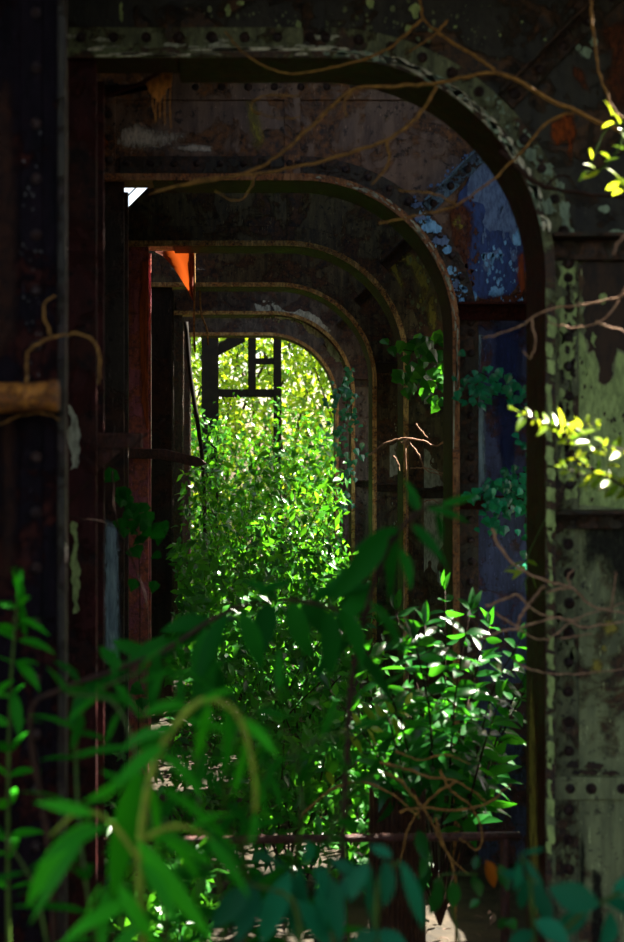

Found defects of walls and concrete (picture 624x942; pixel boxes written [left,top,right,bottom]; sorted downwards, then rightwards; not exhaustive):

peeling [87,0,574,232]
peeling [335,153,526,449]
peeling [390,423,398,477]
peeling [424,449,443,588]
peeling [545,260,624,883]